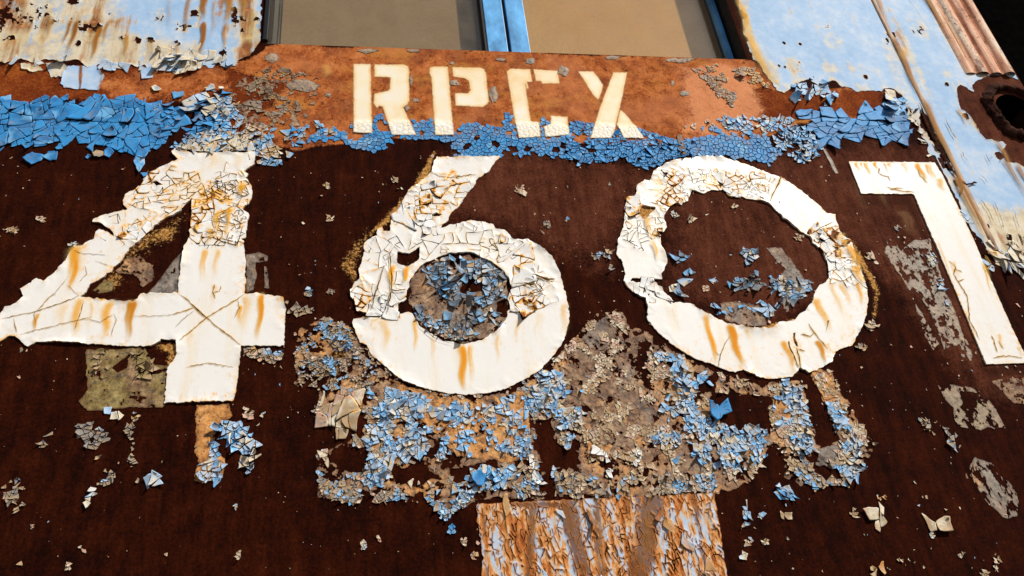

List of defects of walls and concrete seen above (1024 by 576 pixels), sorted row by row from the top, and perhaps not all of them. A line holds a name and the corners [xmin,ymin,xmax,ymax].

corrosion [65,20,79,43]
corrosion [185,0,206,51]
corrosion [894,39,914,82]
peeling [0,43,932,223]
corrosion [955,176,979,217]
crack [6,164,249,334]
crack [365,172,554,308]
crack [142,284,241,366]
crack [789,324,825,365]
peeling [75,348,168,508]
peeling [194,404,266,488]
peeling [243,286,878,576]